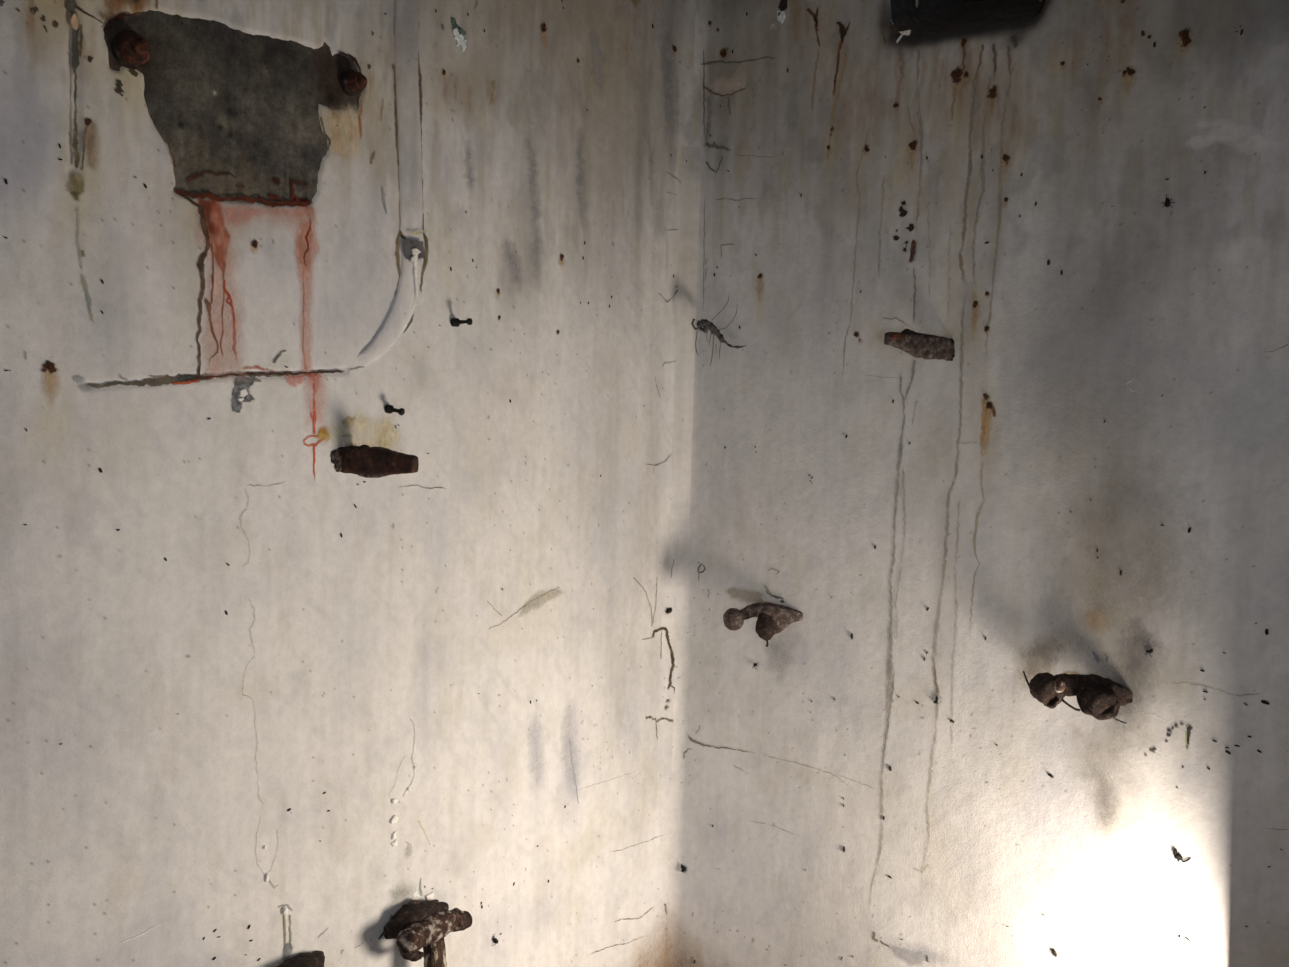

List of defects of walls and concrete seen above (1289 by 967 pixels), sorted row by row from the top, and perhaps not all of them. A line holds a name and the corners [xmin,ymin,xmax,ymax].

peeling [0,0,58,32]
peeling [88,0,371,207]
corrosion [196,199,419,478]
corrosion [884,329,955,361]
crack [74,366,363,390]